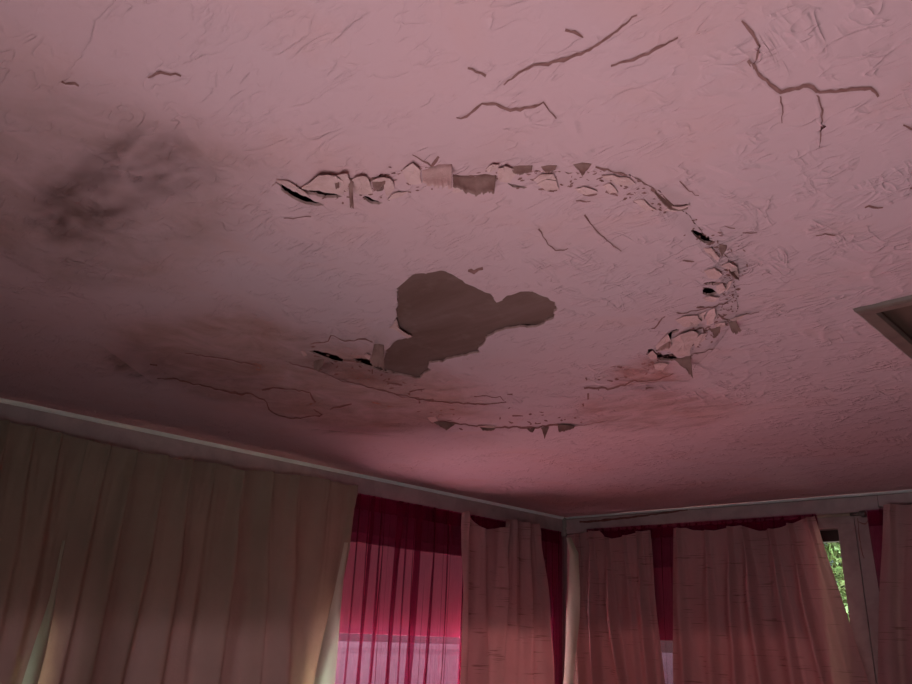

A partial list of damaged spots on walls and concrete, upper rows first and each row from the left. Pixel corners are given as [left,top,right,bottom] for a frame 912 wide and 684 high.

crack [456,15,679,121]
crack [740,21,879,148]
peeling [364,271,556,377]